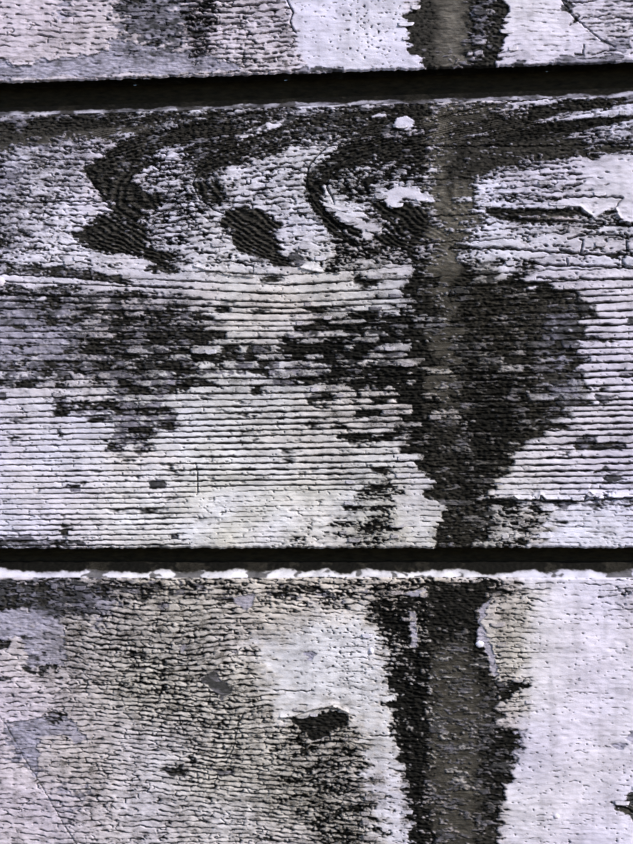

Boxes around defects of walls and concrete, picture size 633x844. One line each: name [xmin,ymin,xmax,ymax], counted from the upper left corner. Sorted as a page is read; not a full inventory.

peeling [278,708,349,742]
spalling [610,786,633,820]